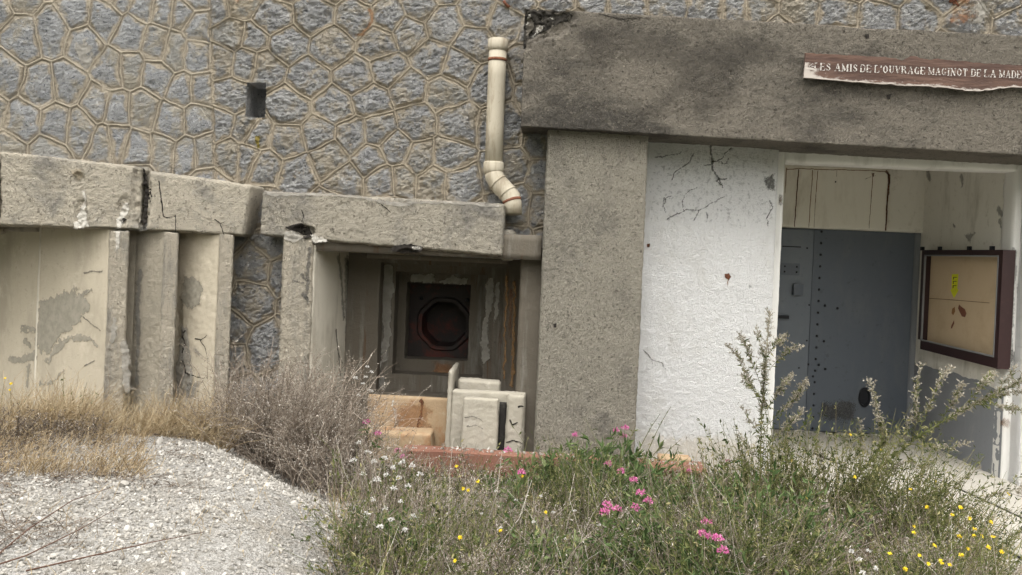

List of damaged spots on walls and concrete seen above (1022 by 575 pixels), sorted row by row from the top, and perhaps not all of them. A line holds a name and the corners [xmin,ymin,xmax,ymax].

spalling [523,8,573,49]
crack [158,181,176,232]
spalling [284,223,327,305]
leakage [8,286,98,388]
leakage [110,318,131,392]